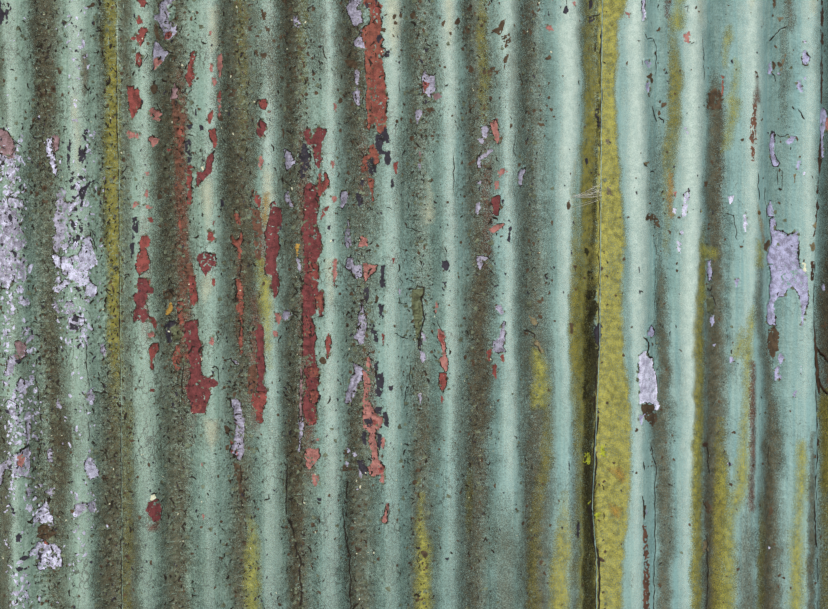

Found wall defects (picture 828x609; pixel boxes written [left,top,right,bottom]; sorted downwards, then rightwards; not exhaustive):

rust [127,86,162,121]
peeling [92,0,210,79]
rust [360,0,388,201]
rust [133,235,159,370]
peeling [139,272,199,368]
rust [166,51,223,415]
rust [232,210,281,428]
rust [249,189,282,299]
rust [295,127,337,487]
rust [362,351,385,483]
peeling [636,351,661,410]
peeling [765,201,815,327]